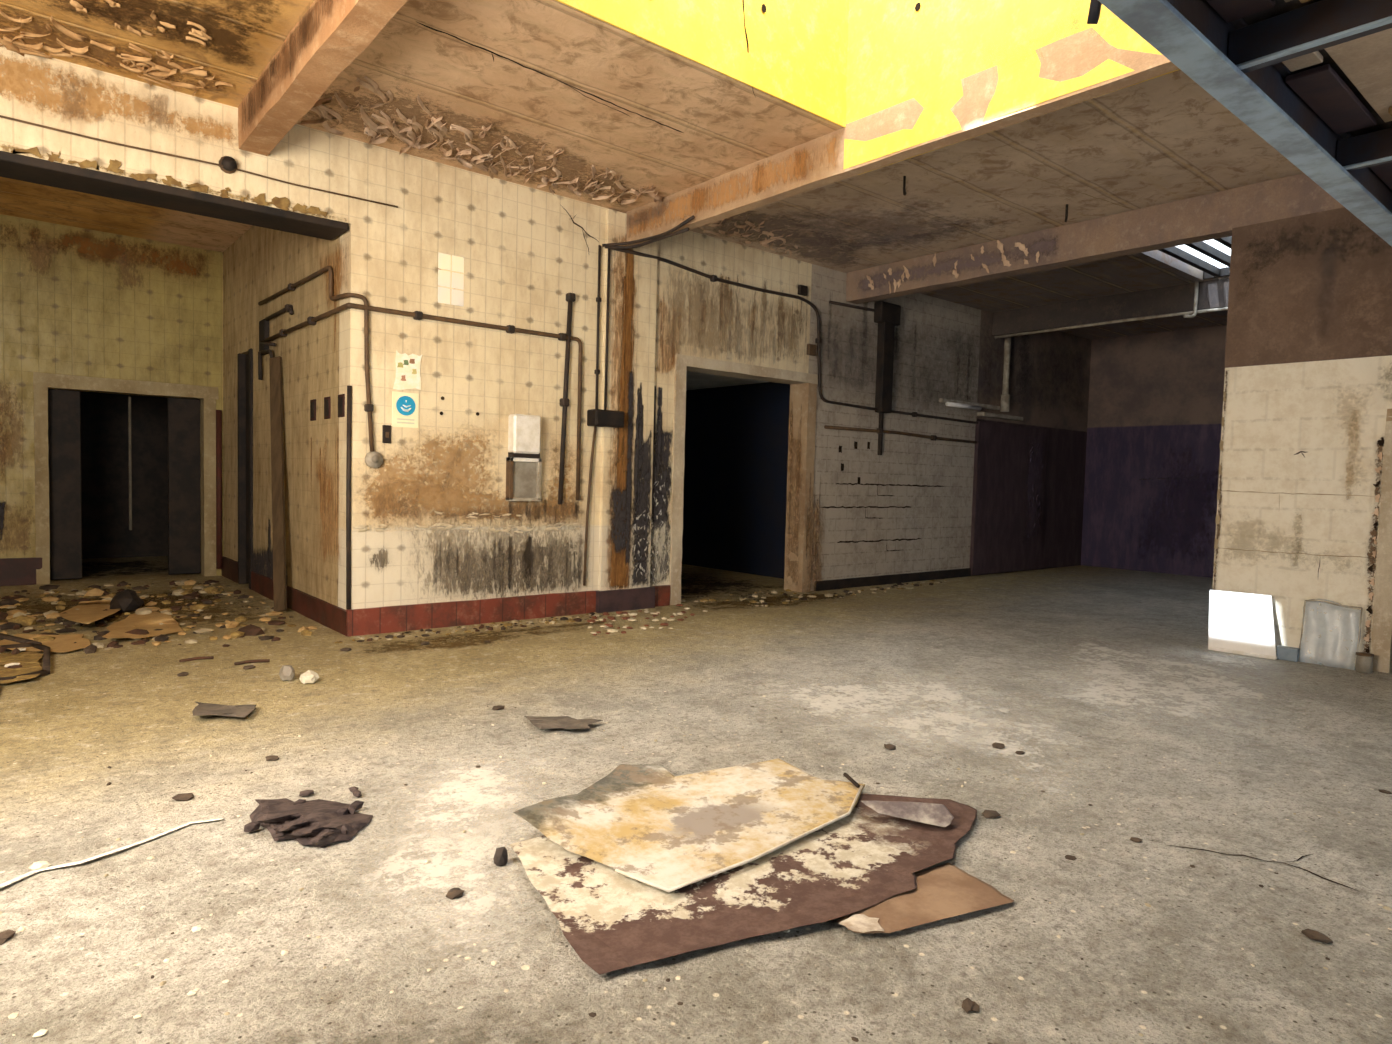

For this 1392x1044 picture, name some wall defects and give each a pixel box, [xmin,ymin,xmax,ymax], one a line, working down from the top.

peeling [0,0,233,96]
spalling [1,144,334,218]
peeling [300,76,664,206]
damp [0,225,206,285]
peeling [699,211,1058,293]
damp [667,273,807,360]
damp [634,383,662,515]
damp [366,435,581,597]